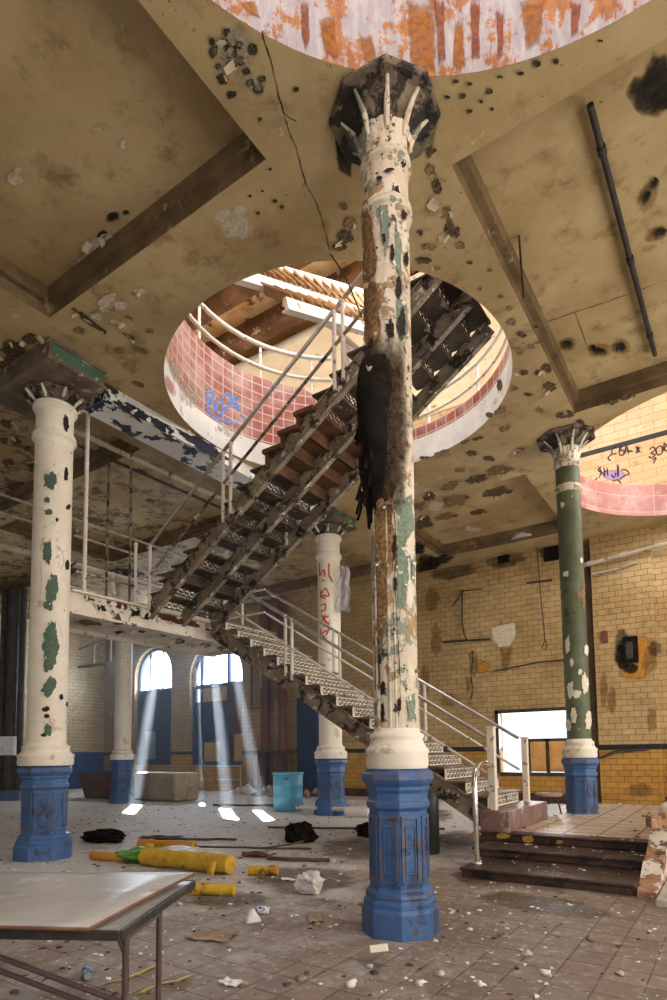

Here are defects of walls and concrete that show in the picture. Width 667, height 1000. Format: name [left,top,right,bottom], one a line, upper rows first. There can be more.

flaking render [209,28,266,99]
crack [262,30,330,249]
flaking render [445,79,494,113]
peeling [68,210,129,267]
peeling [332,145,465,346]
peeling [498,294,545,356]
peeling [0,419,69,522]
peeling [113,399,229,461]
peeling [497,379,532,396]
peeling [373,436,516,722]
peeling [40,539,70,737]
peeling [565,635,592,731]